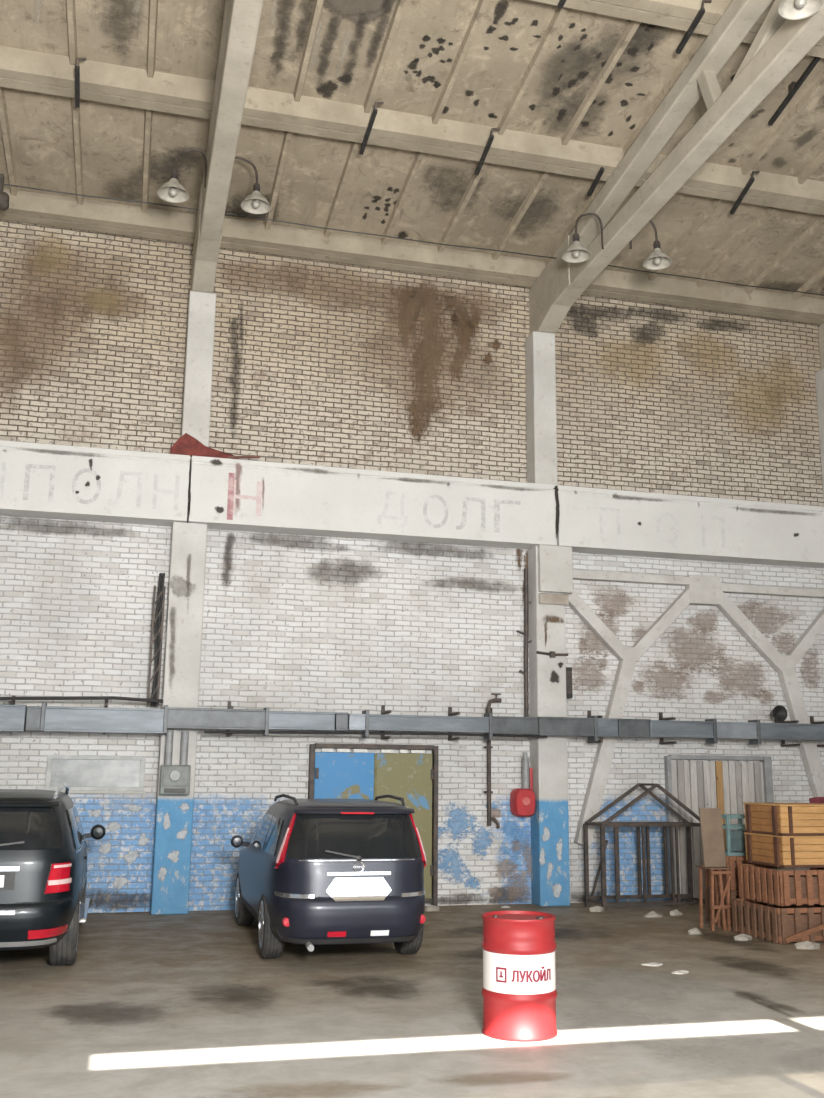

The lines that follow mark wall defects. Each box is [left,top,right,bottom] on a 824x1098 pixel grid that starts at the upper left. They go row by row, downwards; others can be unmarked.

water stain [272,0,314,69]
water stain [317,18,338,75]
water stain [344,0,390,85]
water stain [547,23,664,126]
water stain [509,200,549,228]
water stain [570,305,678,342]
water stain [704,319,741,331]
water stain [14,520,99,533]
peeling [158,813,188,881]
peeling [438,805,529,889]
peeling [539,827,562,898]